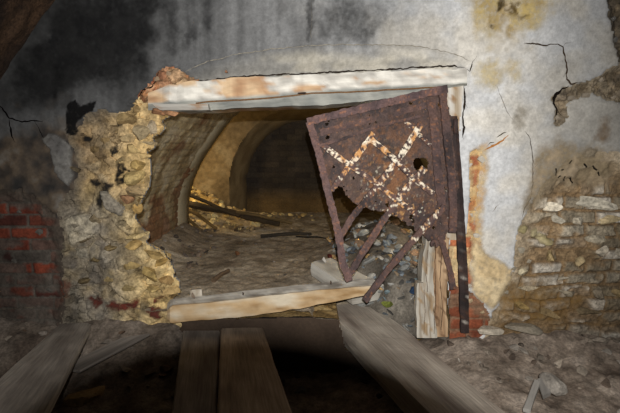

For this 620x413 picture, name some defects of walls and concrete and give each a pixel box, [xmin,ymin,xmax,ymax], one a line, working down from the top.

crack [0,106,43,140]
crack [187,4,477,81]
crack [461,86,469,137]
water stain [475,0,544,36]
crack [526,42,580,122]
spalling [551,0,620,126]
spalling [57,67,199,327]
spalling [448,132,620,339]